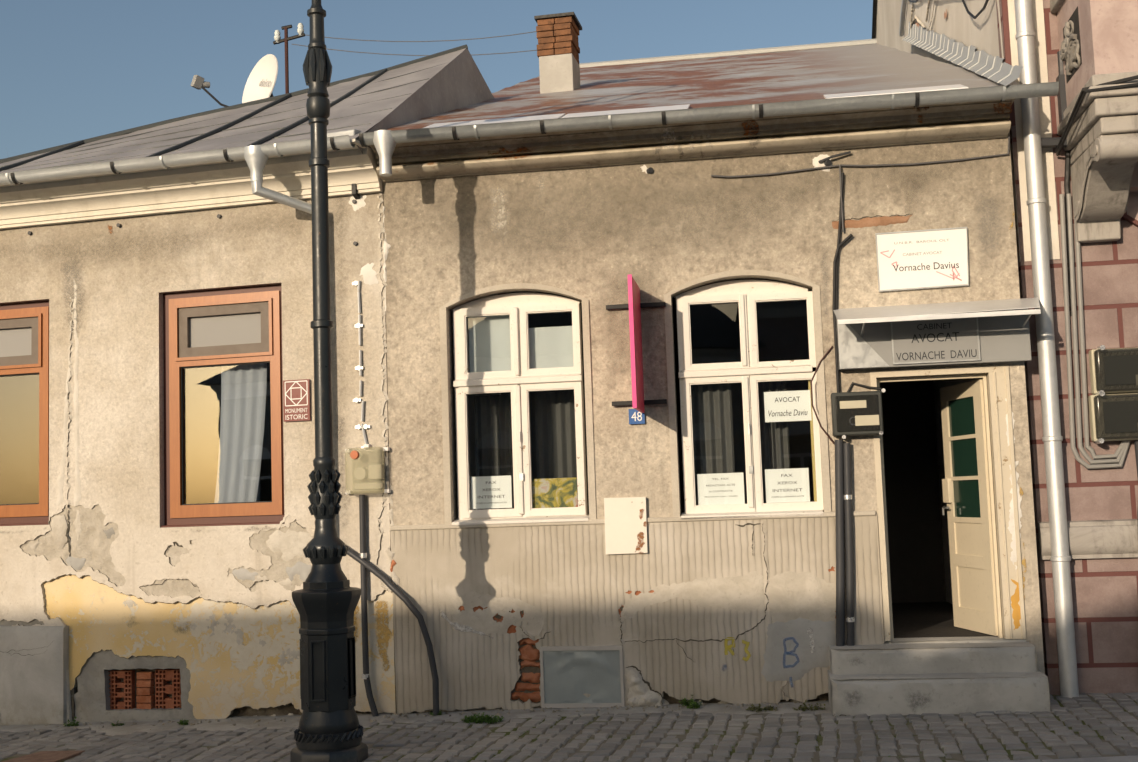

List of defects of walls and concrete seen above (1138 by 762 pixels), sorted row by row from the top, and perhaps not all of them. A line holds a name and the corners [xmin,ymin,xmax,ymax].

flaking render [911,0,947,31]
crack [56,279,81,509]
crack [374,193,400,592]
peeling [20,504,315,719]
peeling [354,590,397,714]
flaking render [459,606,541,703]
crack [618,520,771,662]